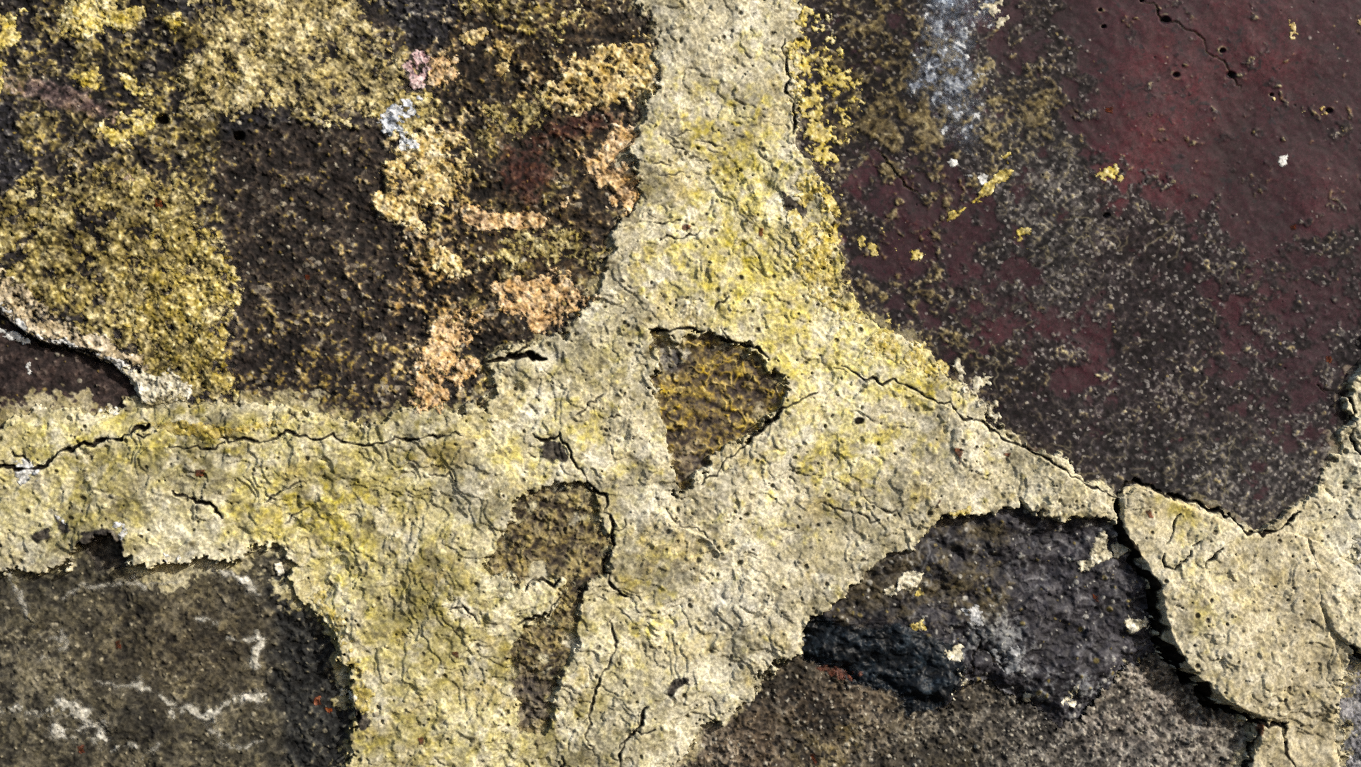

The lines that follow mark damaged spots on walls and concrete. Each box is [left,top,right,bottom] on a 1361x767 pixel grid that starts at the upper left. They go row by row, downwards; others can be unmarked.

peeling [368,27,549,278]
peeling [540,33,659,214]
peeling [0,268,149,371]
peeling [408,307,483,414]
peeling [490,267,601,335]
crack [0,423,462,472]
spalling [32,518,128,571]
spalling [486,481,615,734]
spalling [801,615,967,716]
crack [701,366,1301,767]
peeling [1077,531,1130,572]
crack [1349,645,1361,661]